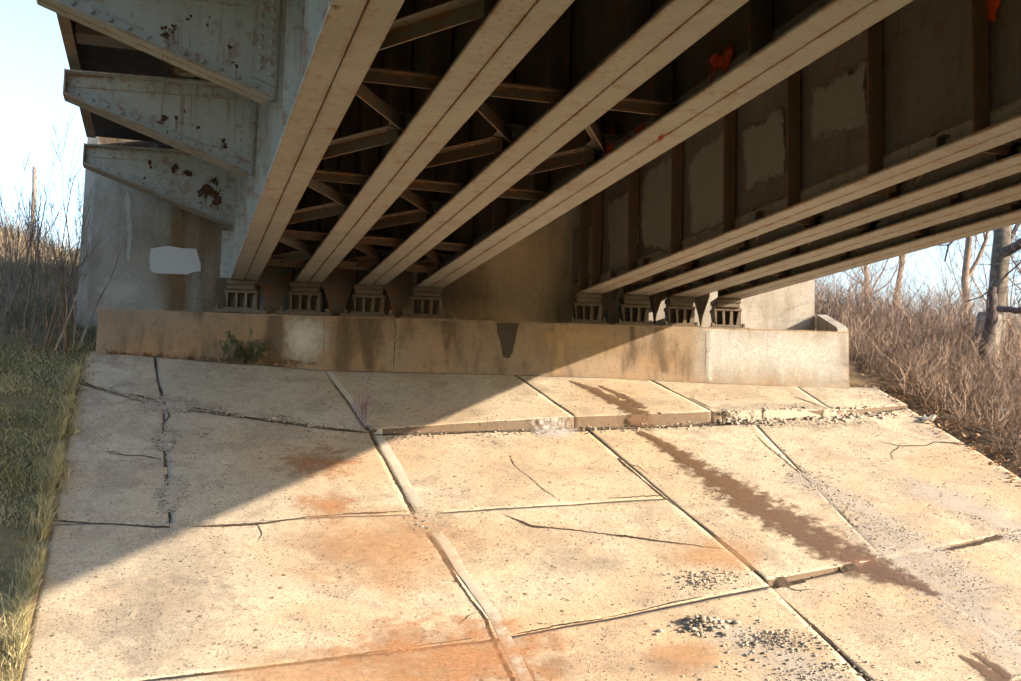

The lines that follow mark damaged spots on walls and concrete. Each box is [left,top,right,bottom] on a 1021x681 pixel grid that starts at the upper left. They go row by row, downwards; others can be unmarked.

leakage [482,218,565,376]
leakage [709,329,838,387]
crack [54,356,178,528]
leakage [537,416,574,437]
crack [884,441,975,461]
leakage [569,380,942,596]
crack [194,375,838,681]
crack [840,563,858,573]
crack [142,651,380,681]